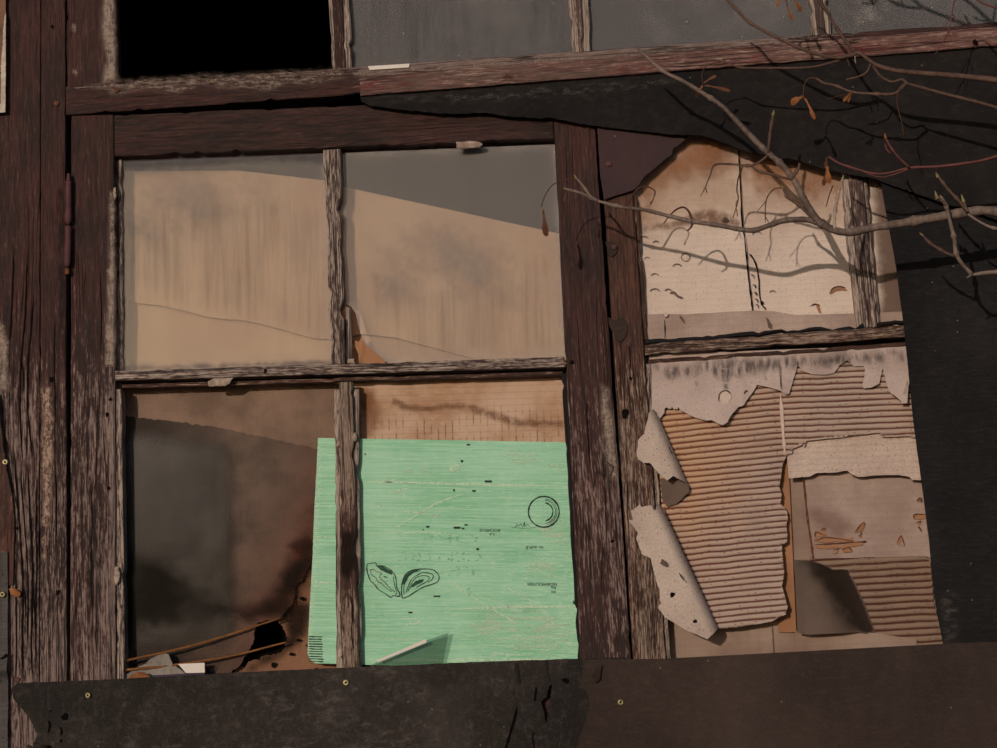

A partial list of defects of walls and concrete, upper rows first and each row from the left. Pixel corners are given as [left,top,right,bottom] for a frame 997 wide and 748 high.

damp [668,142,730,174]
peeling [629,409,718,639]
peeling [814,522,866,553]